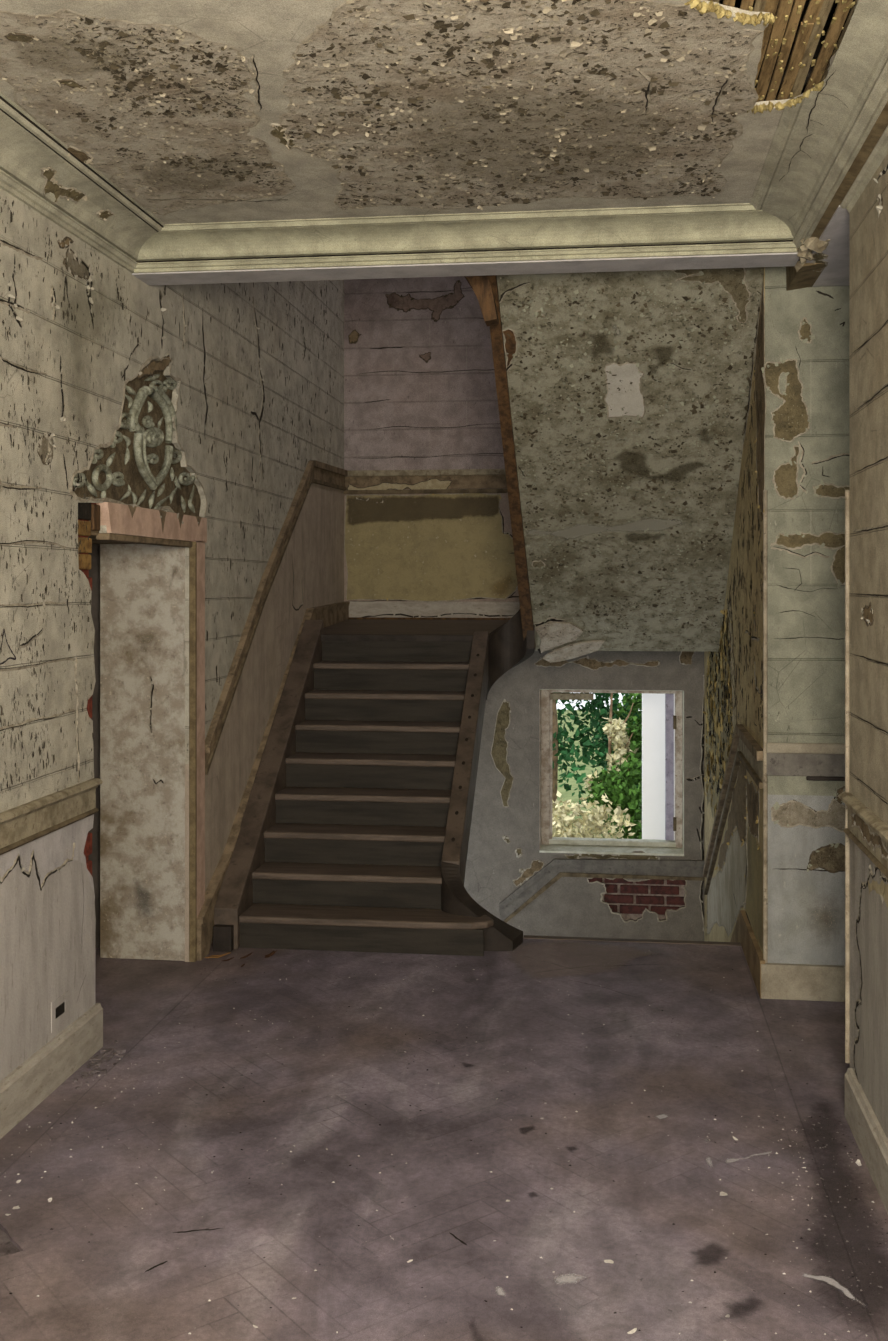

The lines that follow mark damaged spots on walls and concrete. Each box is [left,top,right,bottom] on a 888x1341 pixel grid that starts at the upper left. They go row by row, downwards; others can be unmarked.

peeling [0,0,857,221]
peeling [344,268,888,949]
peeling [0,829,96,1081]